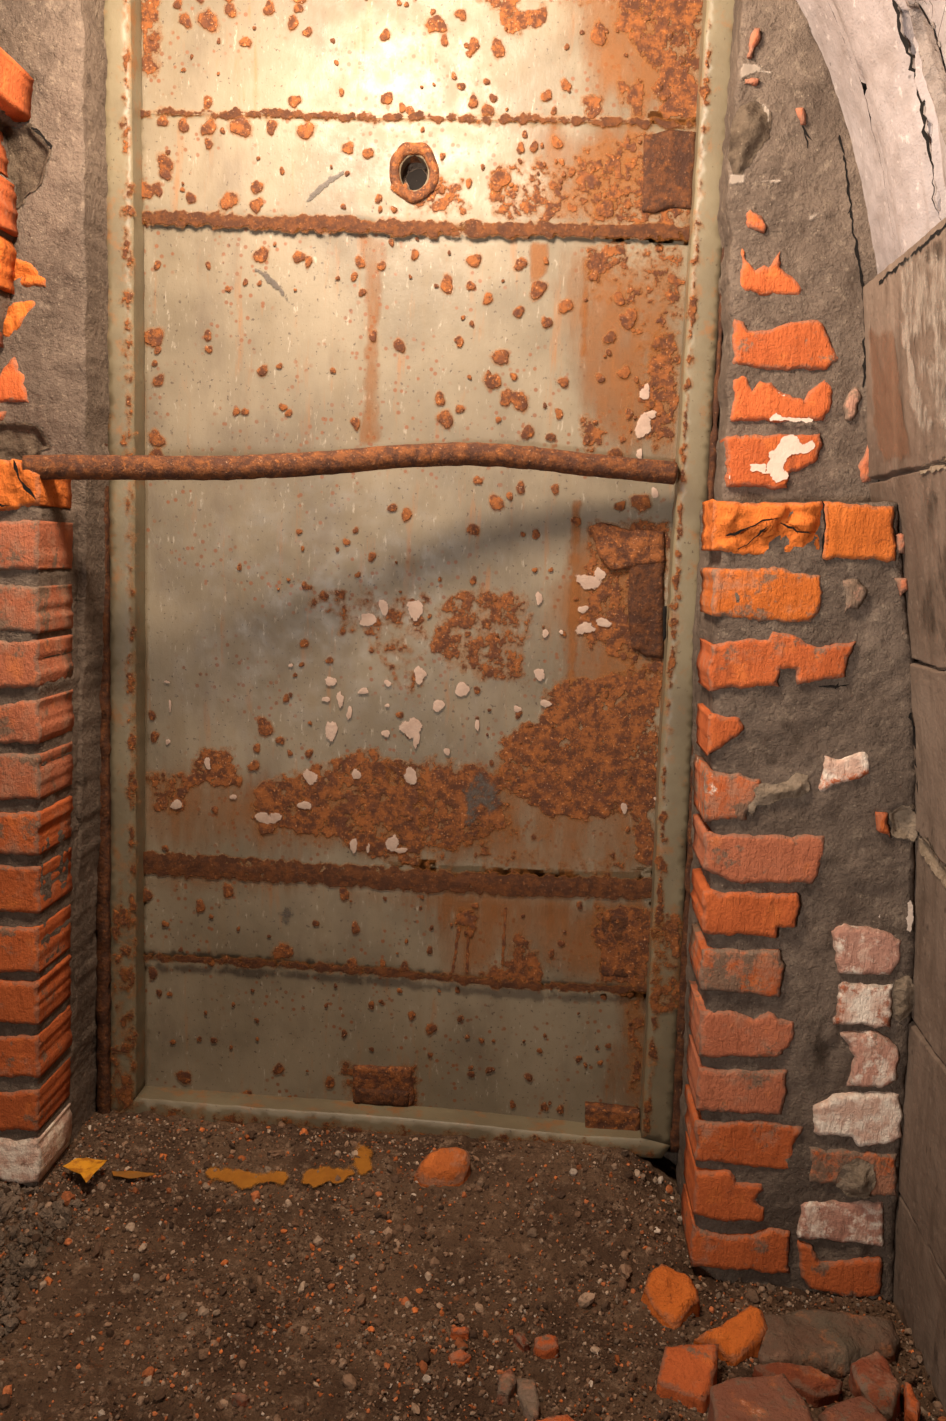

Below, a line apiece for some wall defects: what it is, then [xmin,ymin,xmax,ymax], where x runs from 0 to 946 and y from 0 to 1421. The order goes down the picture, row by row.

spalling [2,123,51,208]
crack [23,125,52,149]
crack [802,0,946,387]
spalling [0,419,52,460]
crack [0,460,36,507]
crack [726,500,826,558]
corrosion [22,0,711,1136]